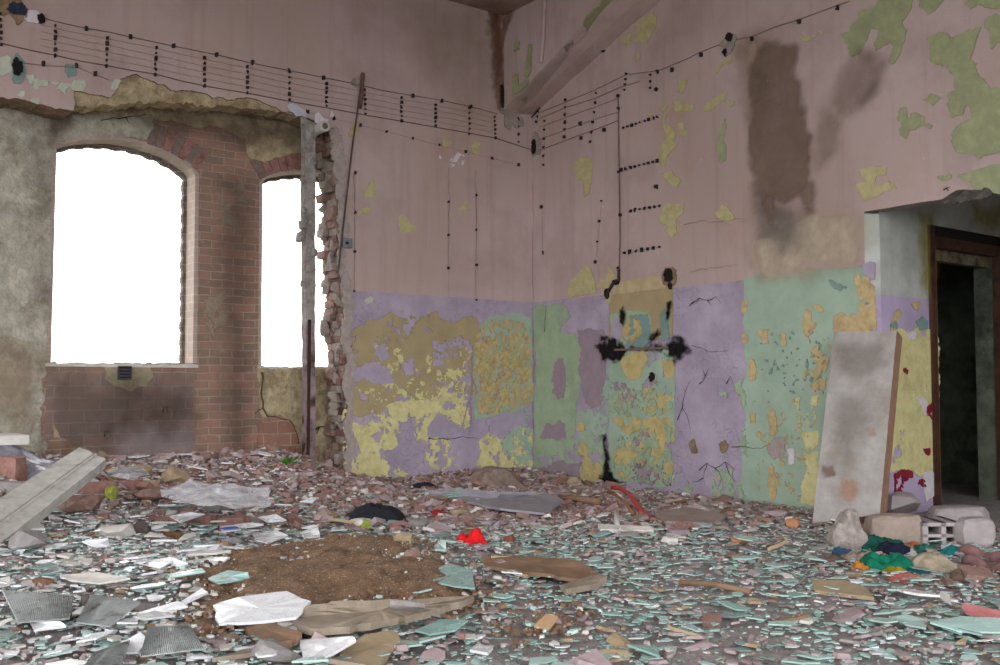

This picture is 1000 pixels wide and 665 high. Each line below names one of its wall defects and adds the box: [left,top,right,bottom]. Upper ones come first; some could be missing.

peeling [839,0,943,65]
damp [743,39,858,277]
peeling [854,166,897,201]
peeling [897,107,933,139]
peeling [923,0,1000,204]
peeling [0,40,697,494]
crack [256,372,325,445]
crack [677,345,733,430]
peeling [706,262,877,510]
peeling [890,301,940,501]
crack [695,444,770,484]